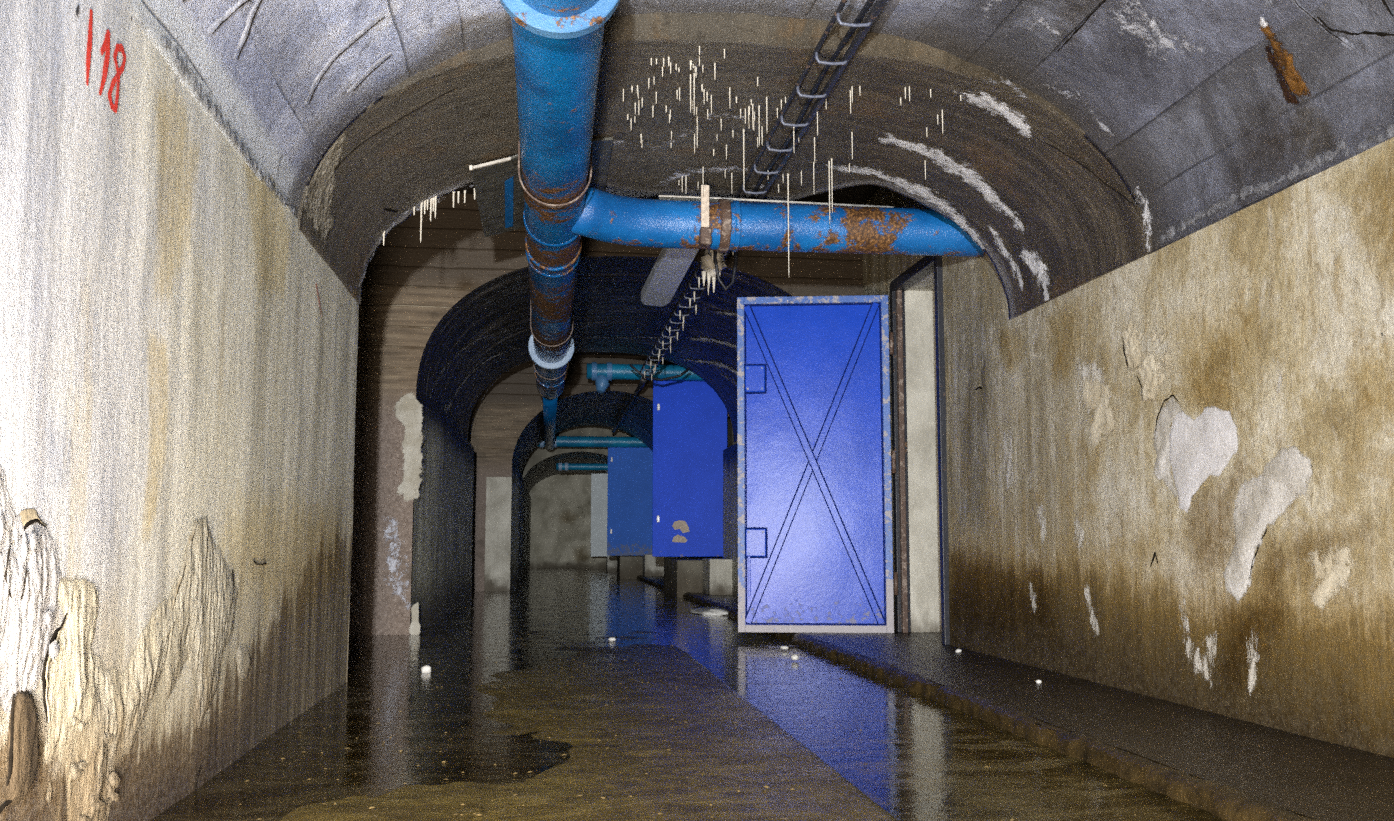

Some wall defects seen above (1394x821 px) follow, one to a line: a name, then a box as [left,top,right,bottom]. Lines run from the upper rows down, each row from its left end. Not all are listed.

crack [206,0,262,61]
crack [304,14,392,104]
rust [1259,17,1311,104]
crack [1264,0,1394,51]
efflorescence [826,133,1050,301]
peeling [394,392,425,502]
spalling [1080,320,1238,513]
spalling [1223,446,1313,602]
peeling [0,468,250,821]
leakage [1084,582,1099,635]
efflorescence [1179,598,1218,687]
leakage [1246,635,1259,698]